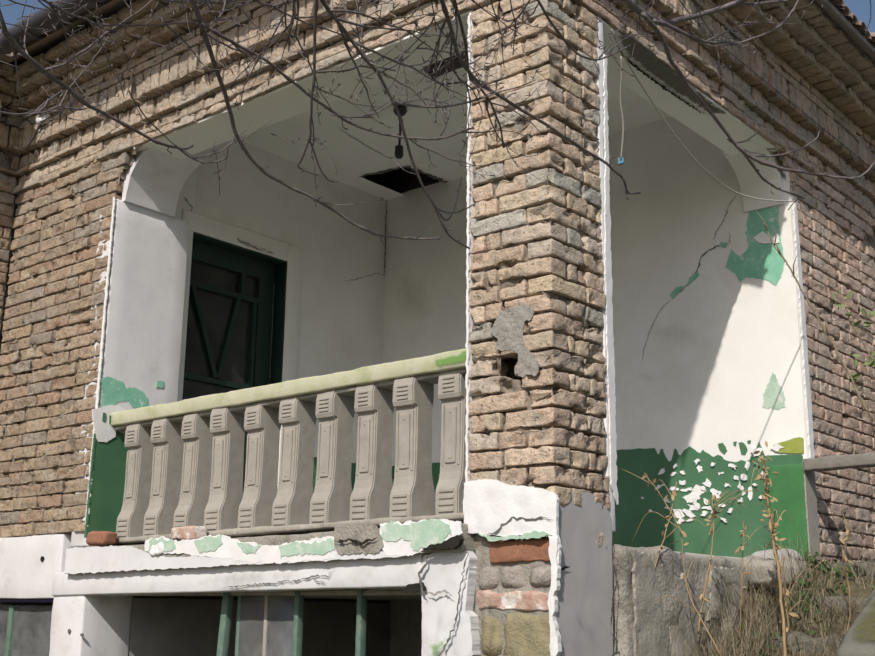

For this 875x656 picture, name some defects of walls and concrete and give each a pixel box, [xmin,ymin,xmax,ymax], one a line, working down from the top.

crack [642,196,736,360]
peeling [726,207,785,285]
peeling [92,376,149,443]
peeling [763,372,786,410]
peeling [655,437,804,524]
peeling [144,519,464,564]
crack [485,516,554,535]
crack [418,548,469,656]